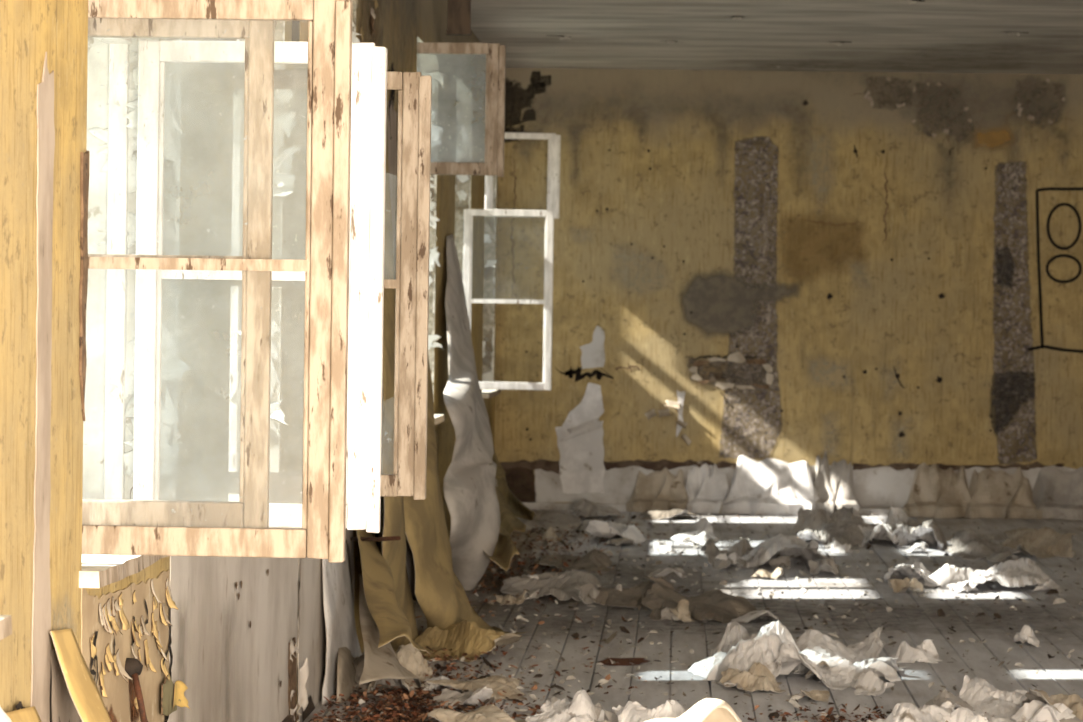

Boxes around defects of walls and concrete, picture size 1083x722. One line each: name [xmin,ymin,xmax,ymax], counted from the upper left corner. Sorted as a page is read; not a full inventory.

peeling [114,38,178,193]
peeling [163,63,185,255]
flaking render [535,466,655,504]
crack [555,364,643,382]
peeling [645,390,692,446]
flaking render [669,301,782,489]
water stain [681,273,797,336]
flaking render [734,136,778,288]
flaking render [852,466,916,509]
flaking render [954,394,1041,491]
flaking render [993,162,1034,375]
flaking render [80,556,326,722]